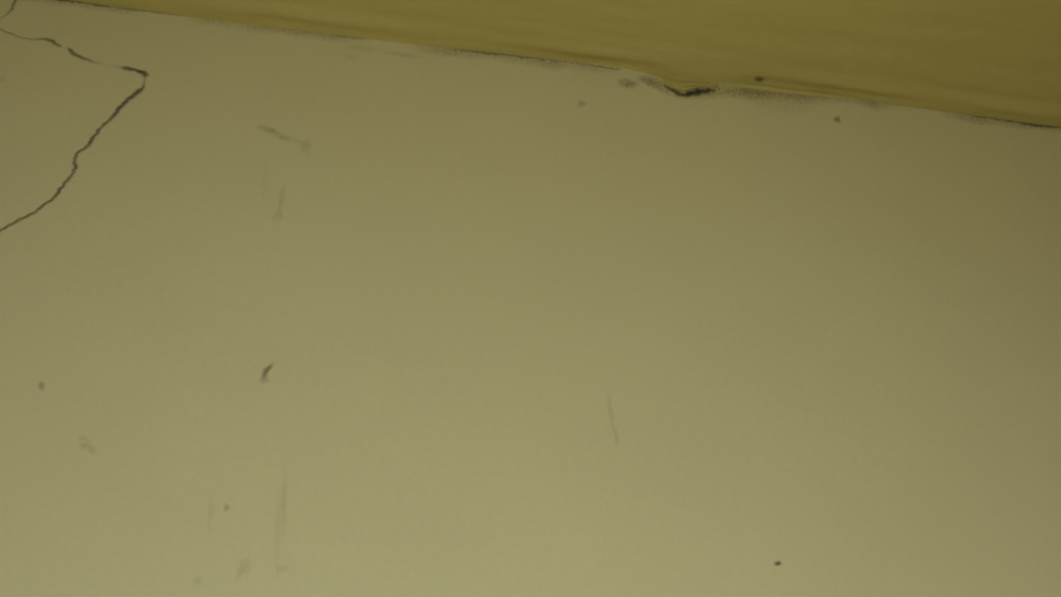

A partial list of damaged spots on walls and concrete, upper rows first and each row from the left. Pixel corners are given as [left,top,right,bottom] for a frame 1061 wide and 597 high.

crack [1,68,147,230]